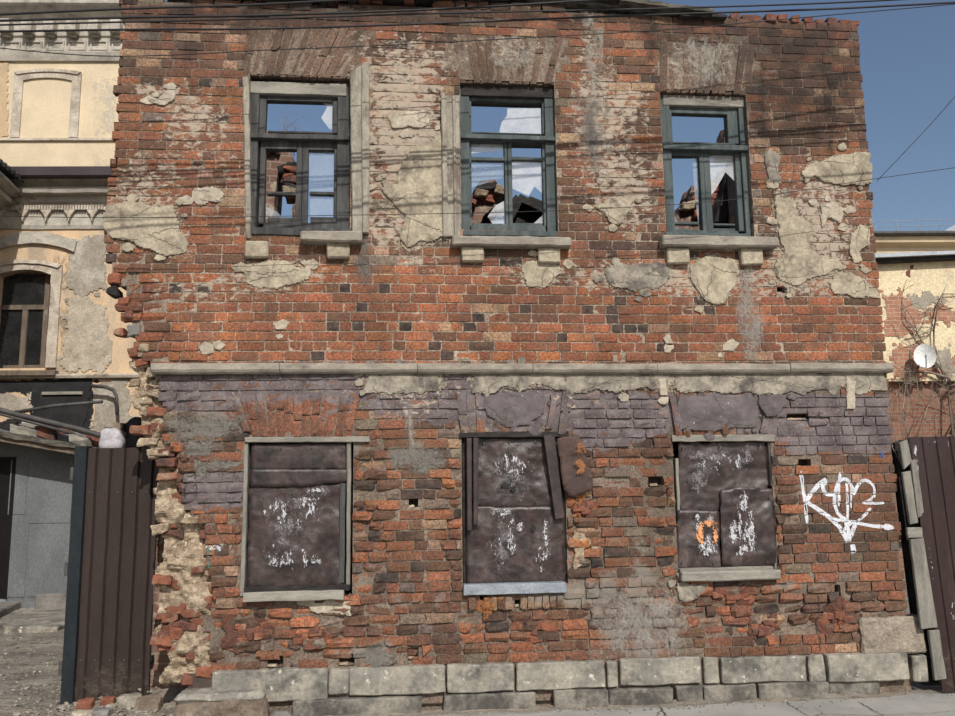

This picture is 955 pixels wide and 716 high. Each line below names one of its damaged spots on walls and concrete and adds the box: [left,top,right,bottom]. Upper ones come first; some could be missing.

peeling [766,179,790,196]
peeling [175,195,194,217]
crack [381,182,440,244]
peeling [836,205,856,231]
peeling [231,262,248,272]
peeling [301,259,319,270]
flaking render [57,234,166,436]
peeling [467,287,955,440]
peeling [353,358,449,398]
spalling [155,447,185,503]
spalling [160,523,184,539]